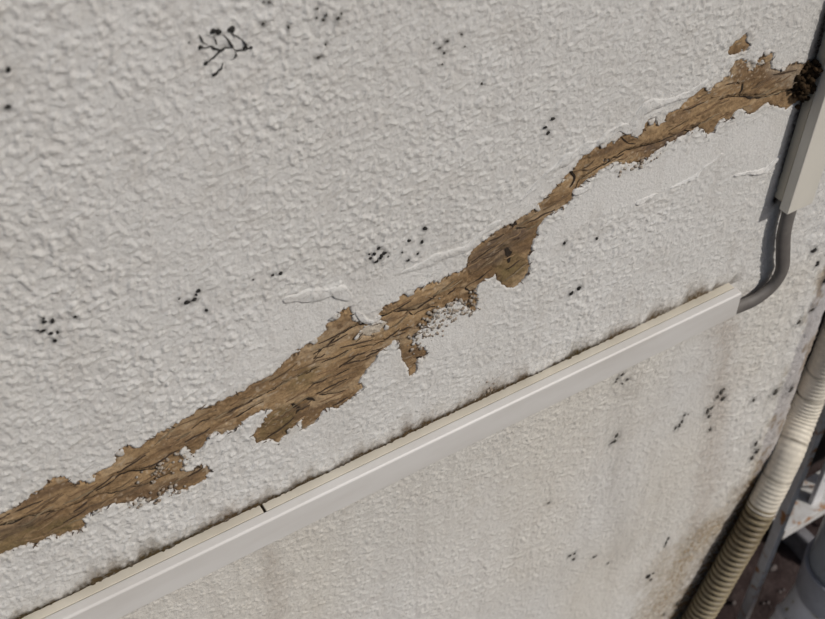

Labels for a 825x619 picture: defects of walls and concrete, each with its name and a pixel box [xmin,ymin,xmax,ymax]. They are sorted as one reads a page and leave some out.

spalling [728,34,750,55]
spalling [0,48,806,554]